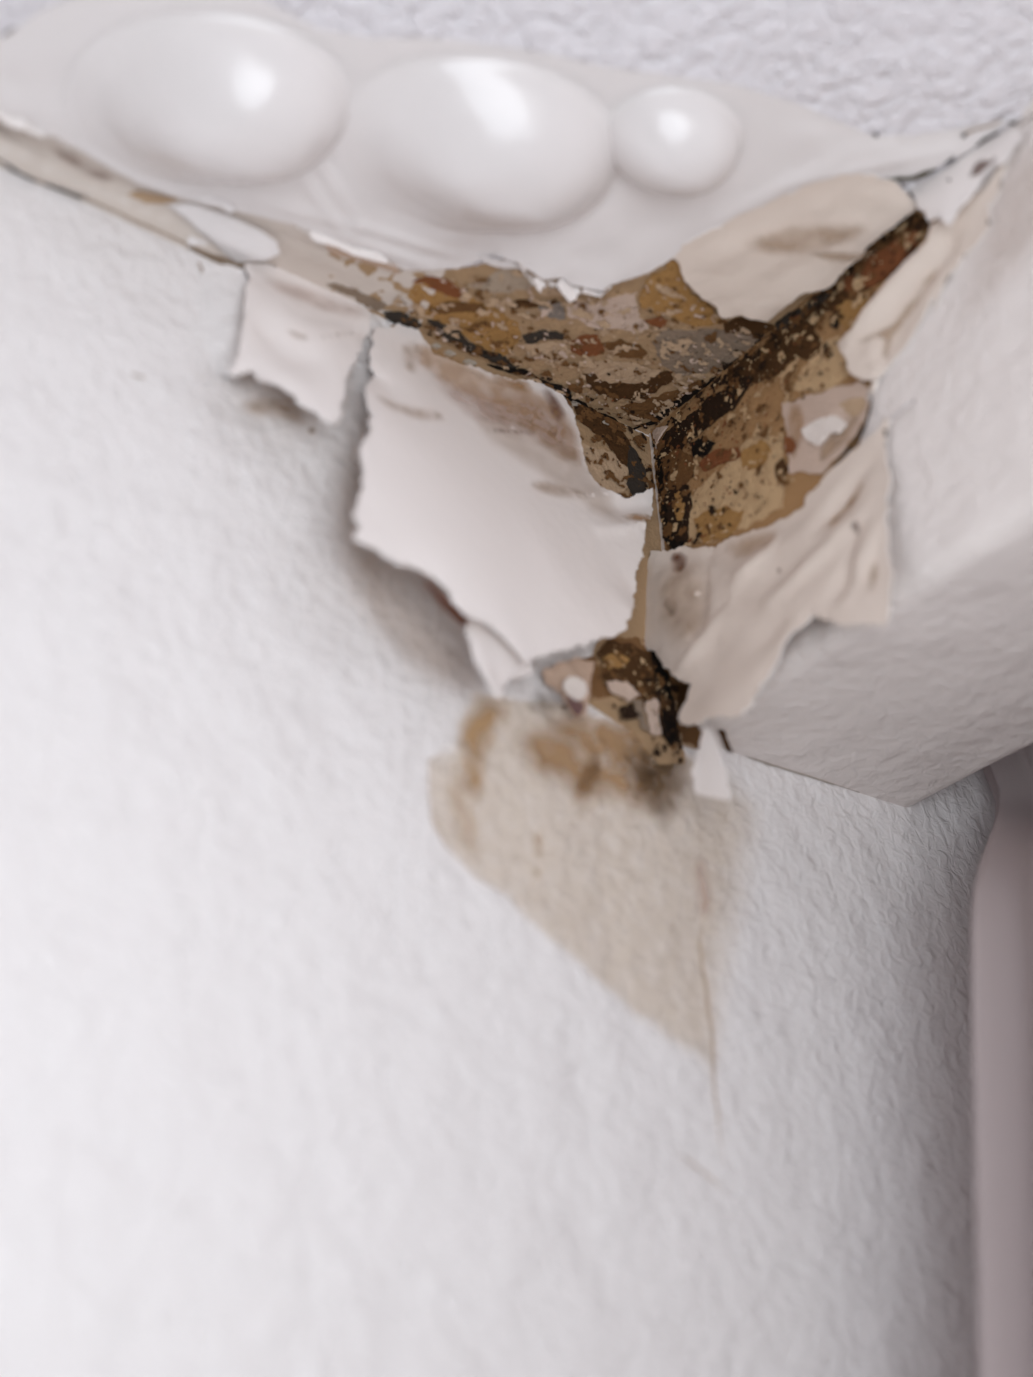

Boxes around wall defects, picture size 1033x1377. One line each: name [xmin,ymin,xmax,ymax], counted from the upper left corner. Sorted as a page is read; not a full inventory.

peeling [0,0,1023,801]
water stain [327,212,930,550]
water stain [467,711,495,755]
water stain [533,640,692,800]